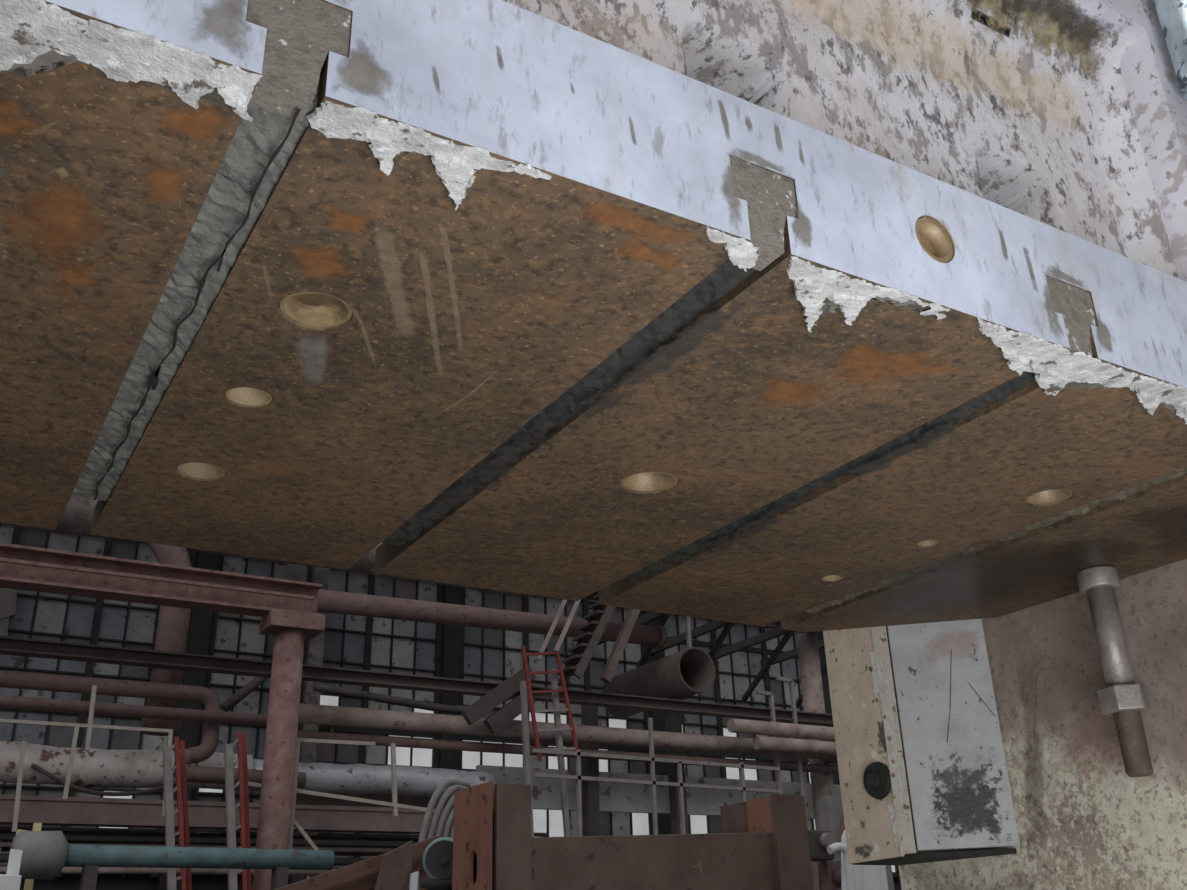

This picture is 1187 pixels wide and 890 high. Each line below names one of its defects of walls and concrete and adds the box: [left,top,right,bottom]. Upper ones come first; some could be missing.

peeling [0,0,263,122]
crack [93,108,301,500]
peeling [786,256,950,333]
peeling [977,317,1187,424]